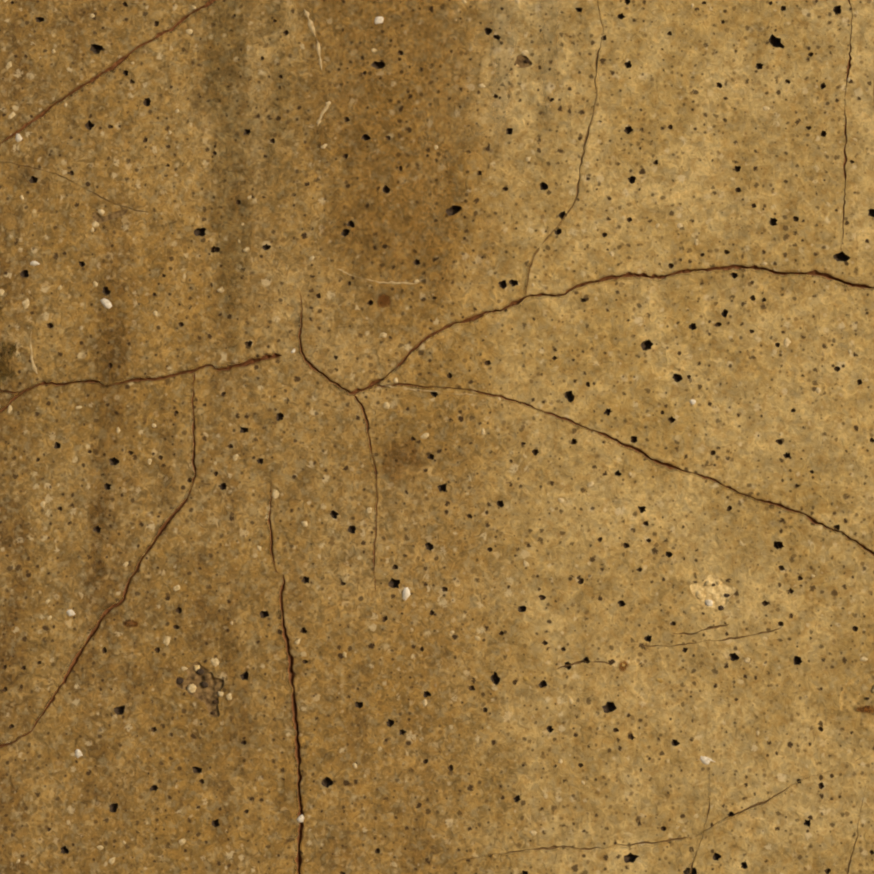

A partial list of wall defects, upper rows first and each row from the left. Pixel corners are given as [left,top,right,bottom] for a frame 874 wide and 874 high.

crack [0,0,217,212]
leakage [0,342,19,384]
crack [298,0,874,591]
crack [0,353,282,747]
crack [265,481,304,874]
crack [556,660,611,670]
crack [631,624,781,647]